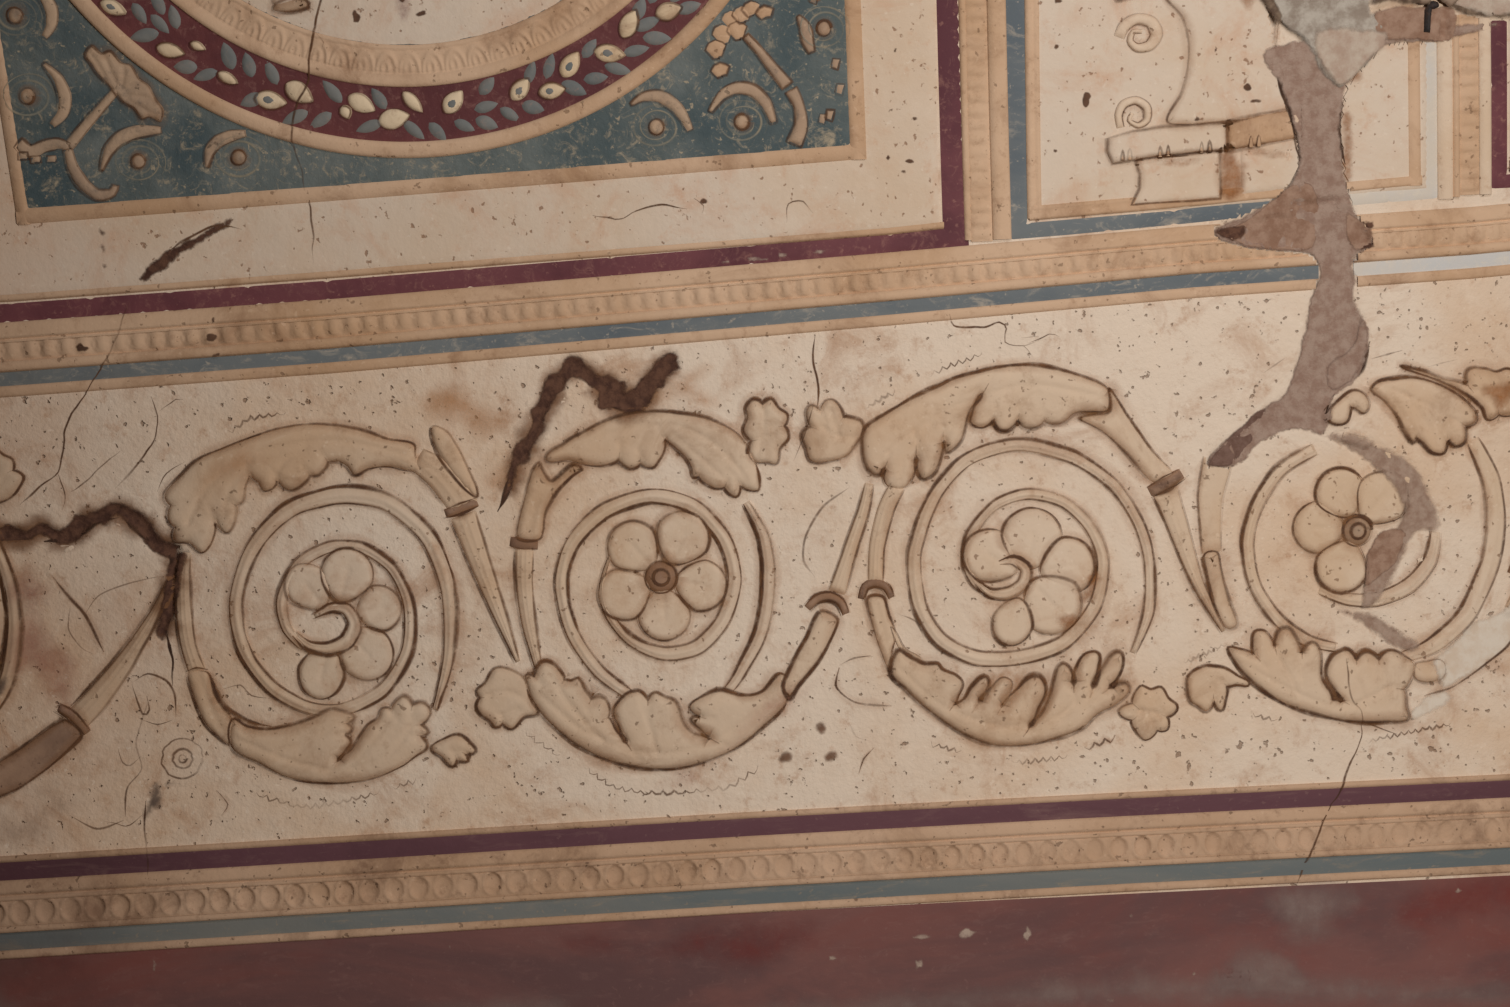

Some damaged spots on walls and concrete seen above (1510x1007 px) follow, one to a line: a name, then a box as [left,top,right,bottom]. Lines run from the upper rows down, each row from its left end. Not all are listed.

spalling [1374,0,1457,41]
crack [140,219,236,281]
crack [498,353,680,511]
crack [0,363,188,684]
peeling [1411,606,1510,718]
crack [1298,722,1390,881]